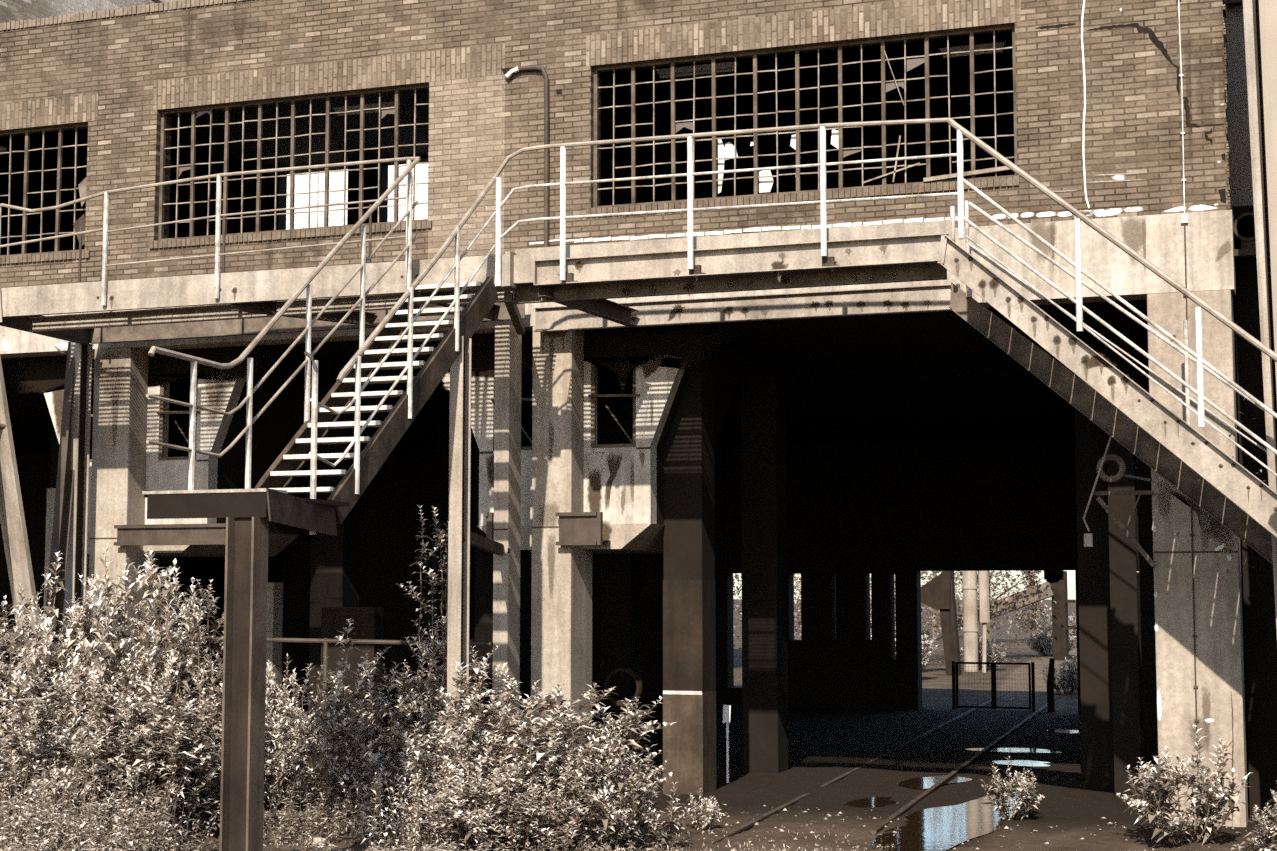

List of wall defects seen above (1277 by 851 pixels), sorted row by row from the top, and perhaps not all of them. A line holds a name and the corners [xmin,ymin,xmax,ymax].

crack [1036,23,1224,145]